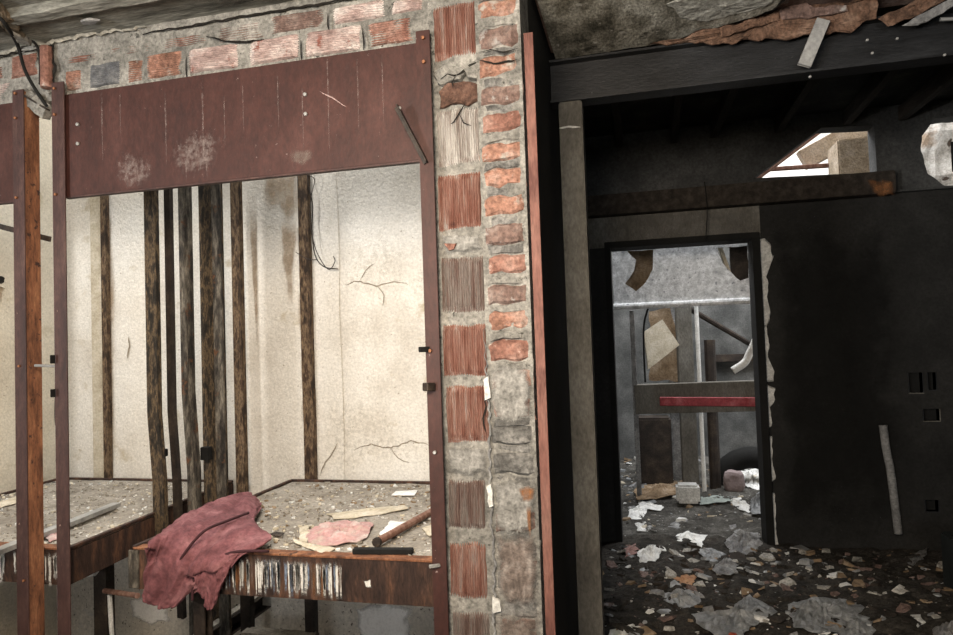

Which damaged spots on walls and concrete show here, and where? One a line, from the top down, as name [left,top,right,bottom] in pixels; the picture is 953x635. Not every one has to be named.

crack [0,0,349,83]
spalling [649,0,953,46]
crack [440,48,518,126]
damp [284,234,294,273]
crack [320,178,429,476]